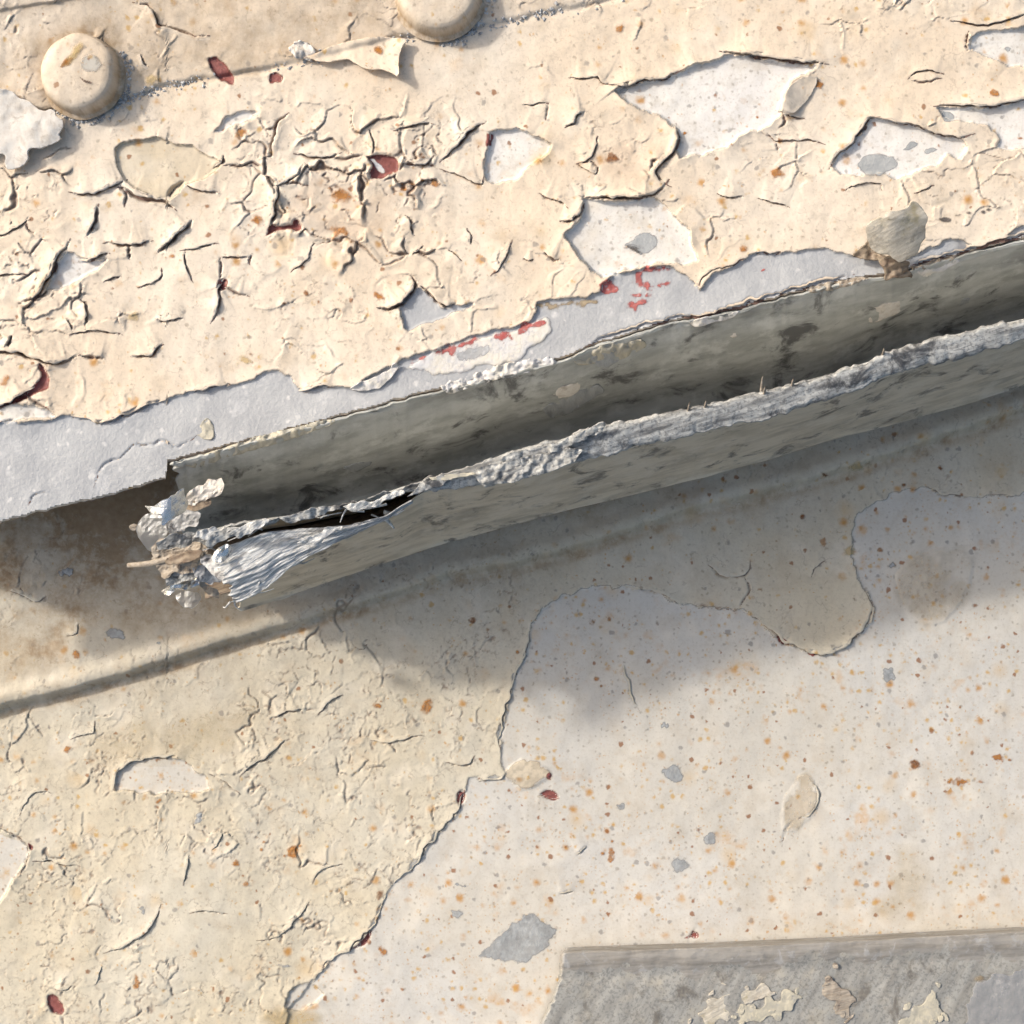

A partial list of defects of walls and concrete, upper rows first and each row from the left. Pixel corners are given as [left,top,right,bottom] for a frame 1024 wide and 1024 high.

peeling [0,88,64,170]
peeling [115,137,220,200]
peeling [289,36,407,77]
crack [401,118,485,185]
crack [522,98,681,223]
peeling [615,54,818,158]
crack [0,112,435,364]
crack [376,215,471,310]
peeling [0,197,884,521]
crack [0,787,81,875]
crack [312,621,531,983]
peeling [285,487,1024,1024]